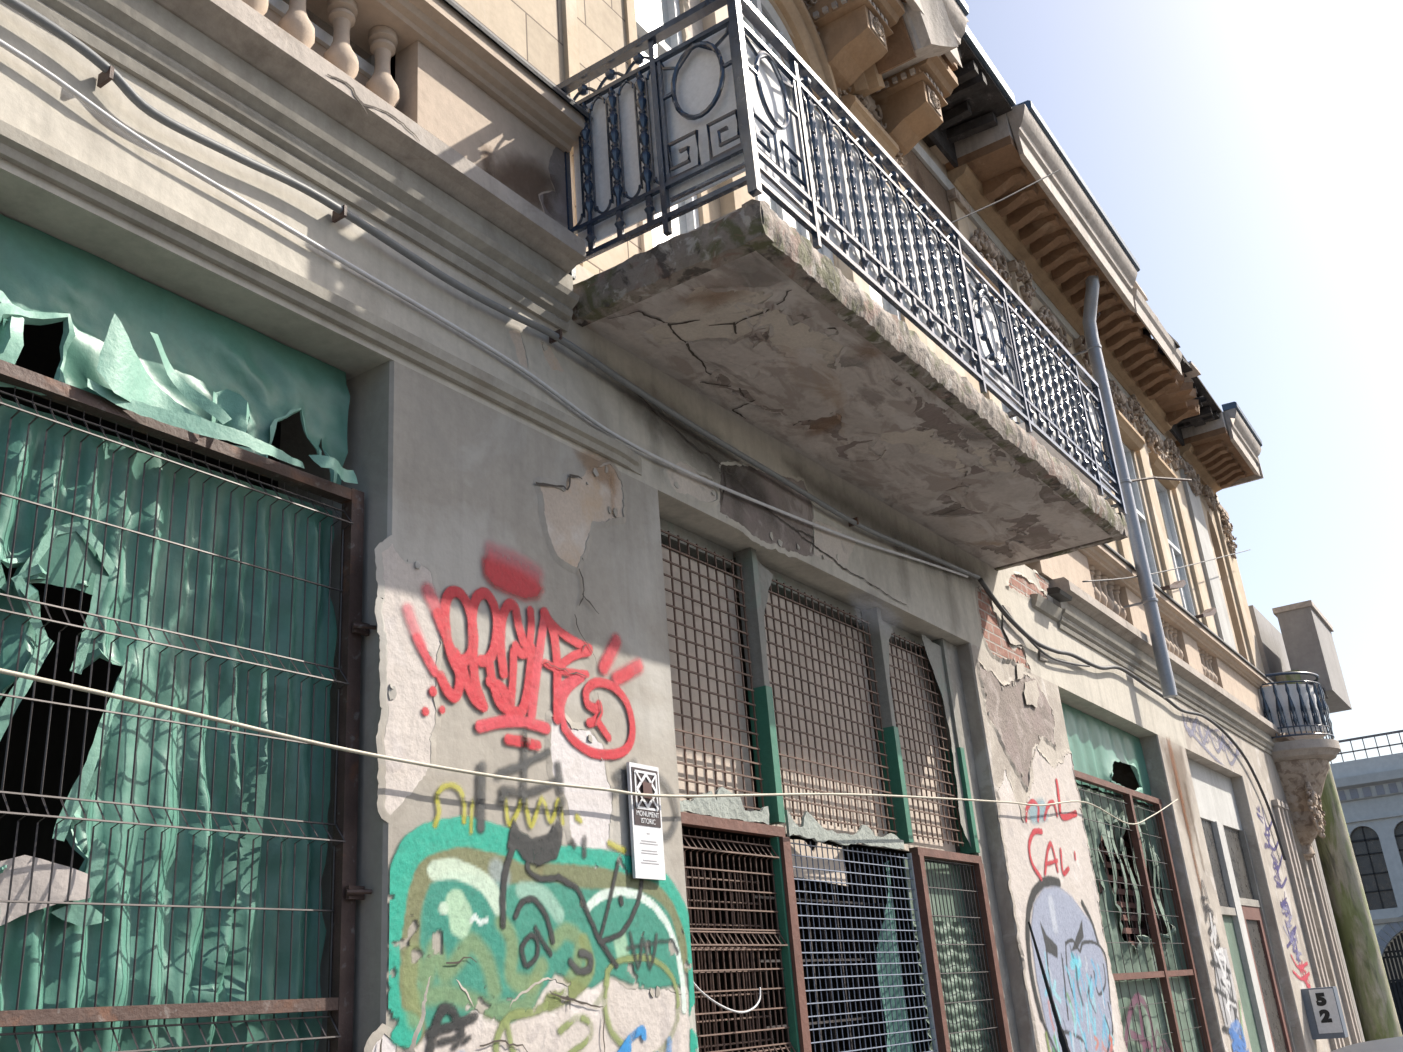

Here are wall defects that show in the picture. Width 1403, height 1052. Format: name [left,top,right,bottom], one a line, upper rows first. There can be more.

flaking render [683,0,703,41]
crack [609,290,791,418]
water stain [624,387,766,503]
peeling [533,458,627,575]
peeling [375,535,445,825]
spalling [572,199,1128,1052]
spalling [364,973,699,1052]